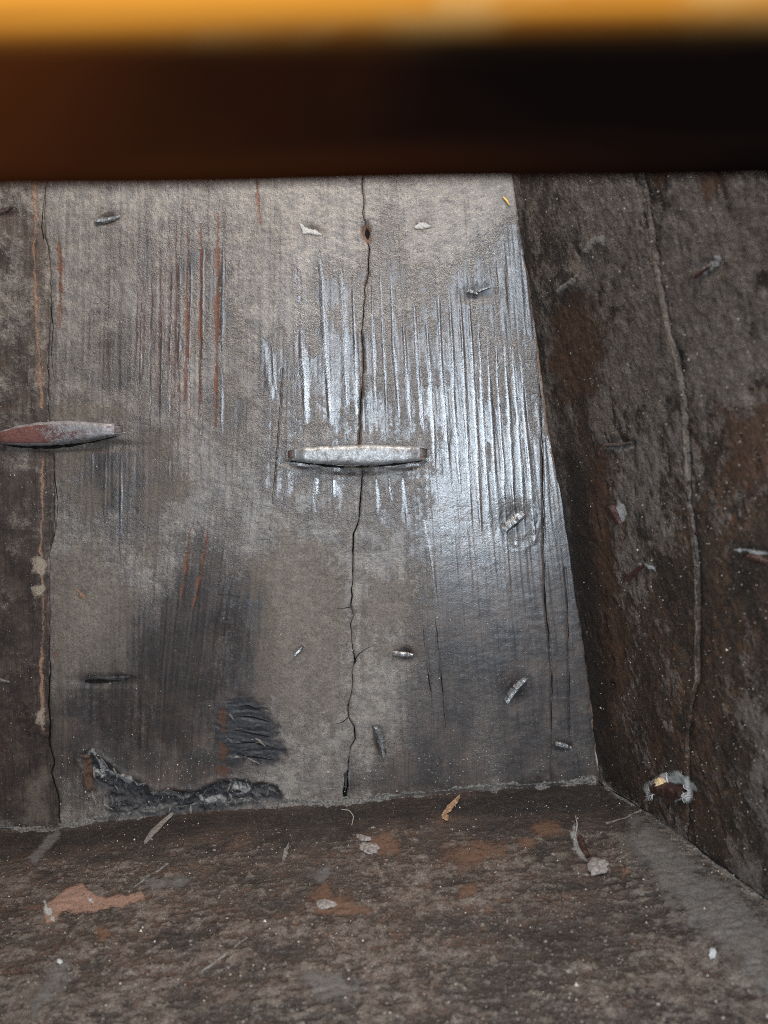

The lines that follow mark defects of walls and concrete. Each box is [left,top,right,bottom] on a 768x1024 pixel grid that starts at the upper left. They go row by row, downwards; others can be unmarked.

corrosion [0,425,86,443]
crack [359,186,372,439]
crack [337,465,376,797]
spalling [82,707,279,821]